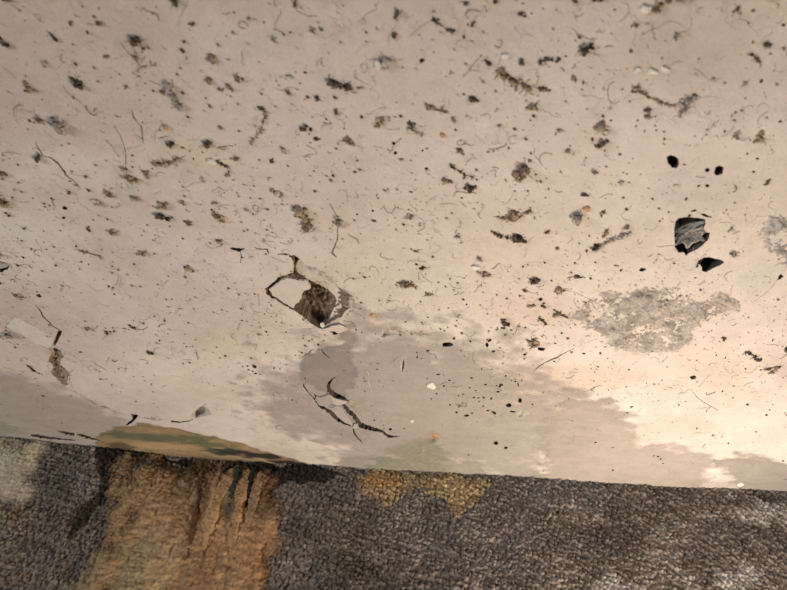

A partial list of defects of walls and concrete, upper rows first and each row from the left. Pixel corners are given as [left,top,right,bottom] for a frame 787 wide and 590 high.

flaking render [254,247,363,335]
peeling [565,283,741,355]
flaking render [674,209,710,255]
flaking render [698,257,724,272]
peeling [757,214,787,280]
damp [0,375,307,518]
crack [303,377,398,442]
damp [264,328,787,533]
damp [68,460,120,538]